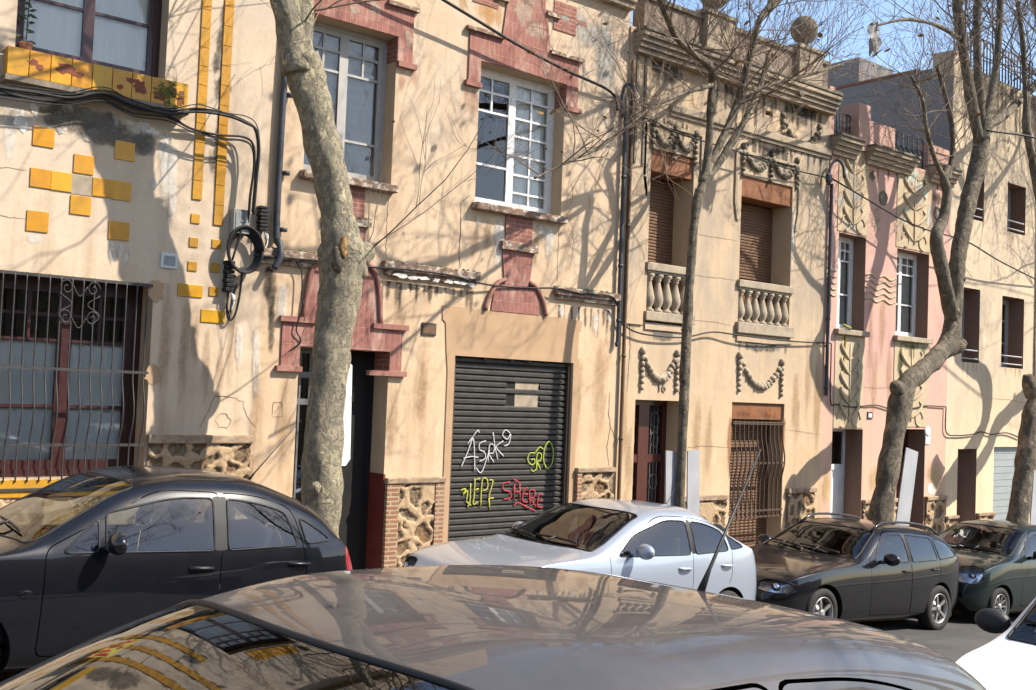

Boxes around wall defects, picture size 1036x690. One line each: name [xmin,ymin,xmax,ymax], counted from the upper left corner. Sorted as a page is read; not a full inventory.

damp [5,105,177,215]
peeling [393,273,475,288]